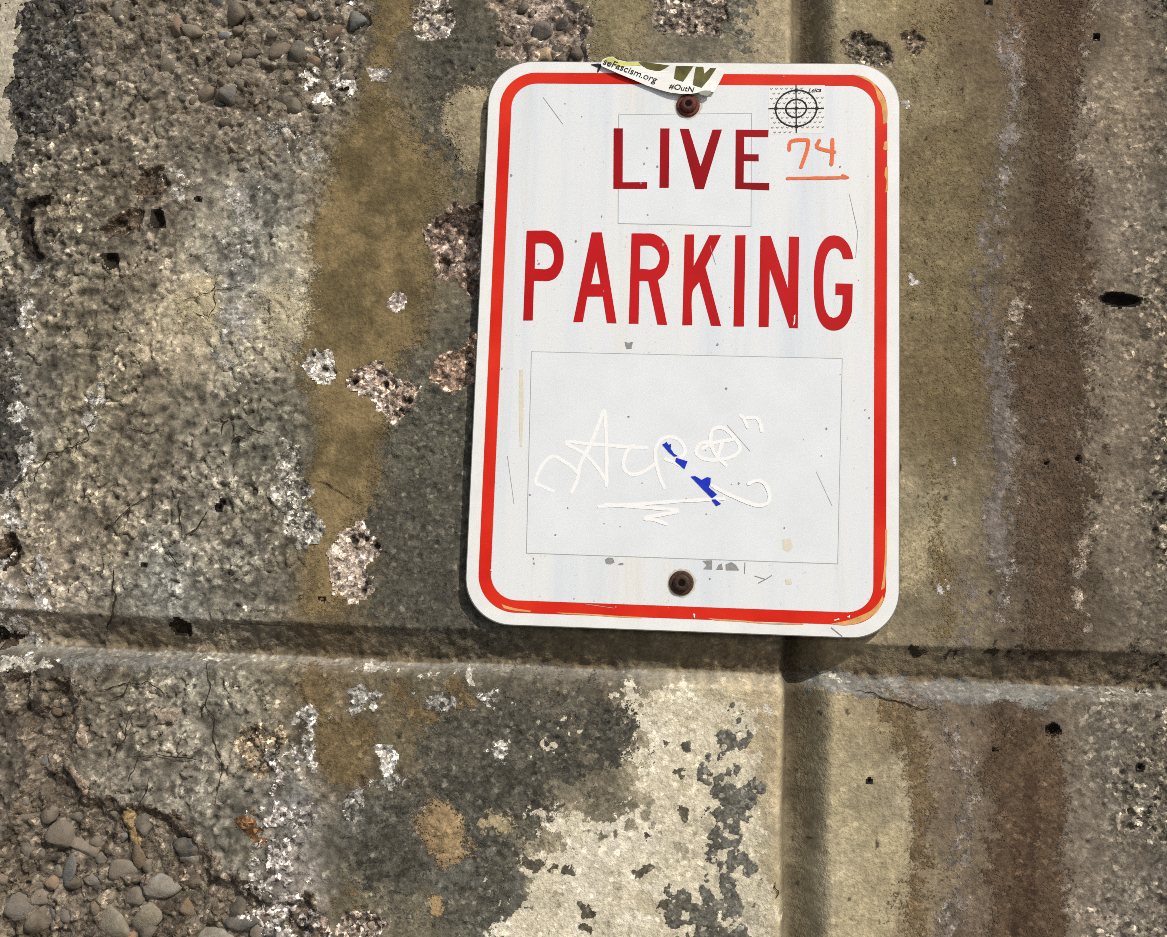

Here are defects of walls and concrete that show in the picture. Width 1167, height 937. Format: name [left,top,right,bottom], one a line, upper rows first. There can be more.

spalling [408,0,457,41]
spalling [487,0,594,63]
spalling [643,0,732,39]
peeling [0,0,36,166]
damp [1074,0,1100,183]
spalling [300,332,477,427]
damp [896,0,1045,672]
damp [1071,287,1102,332]
spalling [270,438,383,605]
damp [1069,521,1101,635]
peeling [536,715,583,755]
peeling [523,805,558,839]